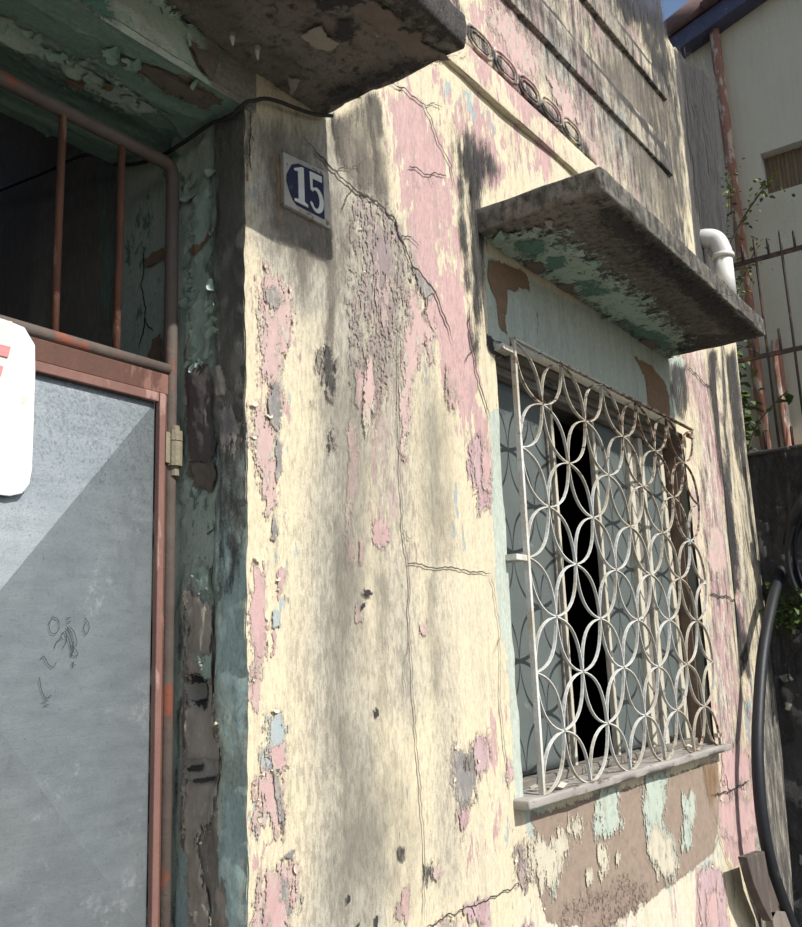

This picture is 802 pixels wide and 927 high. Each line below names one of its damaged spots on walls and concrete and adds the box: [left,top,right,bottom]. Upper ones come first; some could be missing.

crack [302,136,491,419]
peeling [344,188,461,462]
crack [393,83,455,185]
water stain [451,122,502,362]
peeling [483,220,697,361]
water stain [588,0,730,236]
water stain [590,195,763,680]
spalling [177,562,223,927]
peeling [244,556,305,927]
crack [398,325,519,927]
peeling [513,742,754,927]
crack [711,781,748,912]